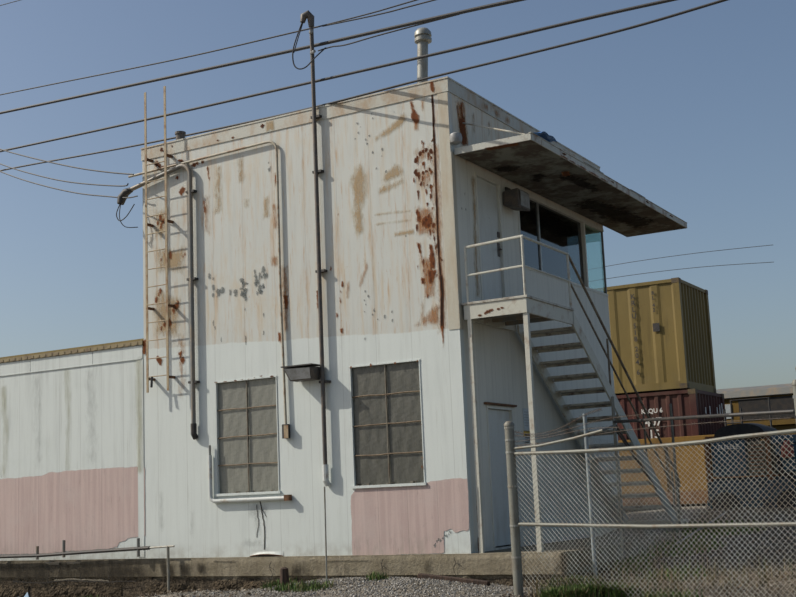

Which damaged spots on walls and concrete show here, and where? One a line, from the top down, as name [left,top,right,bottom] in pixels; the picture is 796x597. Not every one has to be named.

rust [376,101,423,139]
rust [457,102,474,145]
rust [414,148,433,189]
rust [353,169,364,232]
rust [395,209,435,235]
rust [155,288,179,332]
peeling [208,266,268,310]
rust [417,243,436,295]